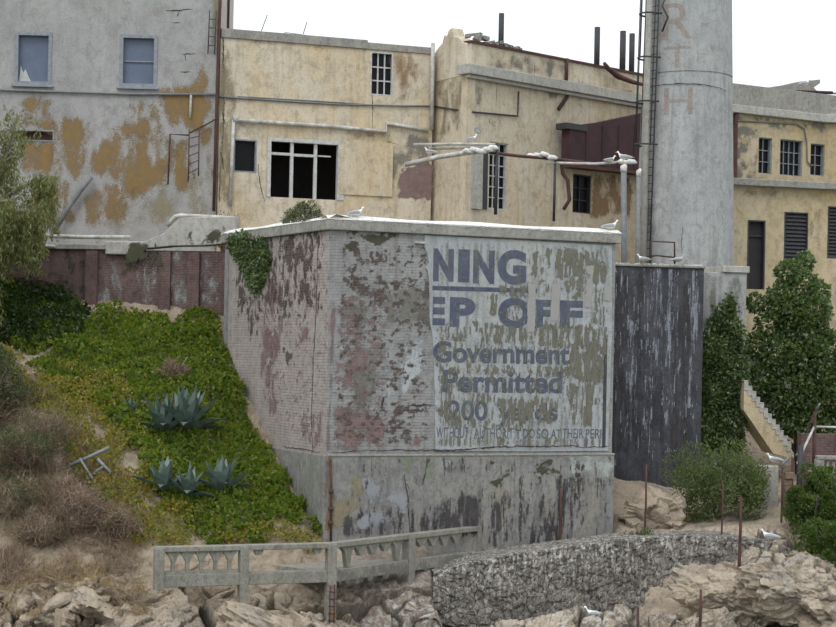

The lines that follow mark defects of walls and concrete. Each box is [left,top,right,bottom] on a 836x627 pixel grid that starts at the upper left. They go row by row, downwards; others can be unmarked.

flaking render [392,135,434,200]
peeling [236,232,330,447]
flaking render [334,242,608,451]
water stain [329,266,700,547]